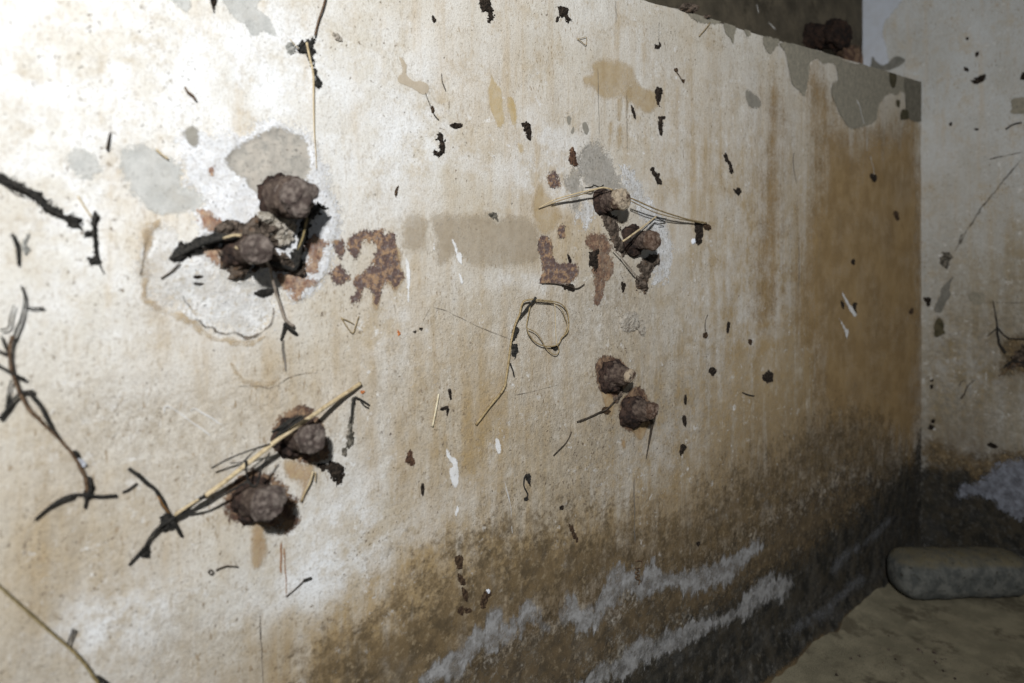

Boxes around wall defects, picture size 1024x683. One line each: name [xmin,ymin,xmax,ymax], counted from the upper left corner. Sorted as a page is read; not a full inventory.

peeling [688,0,922,130]
flaking render [224,126,312,193]
corrosion [546,170,561,189]
flaking render [119,144,284,346]
corrosion [276,228,405,307]
corrosion [538,223,579,286]
corrosion [585,232,615,305]
damp [310,56,1024,683]